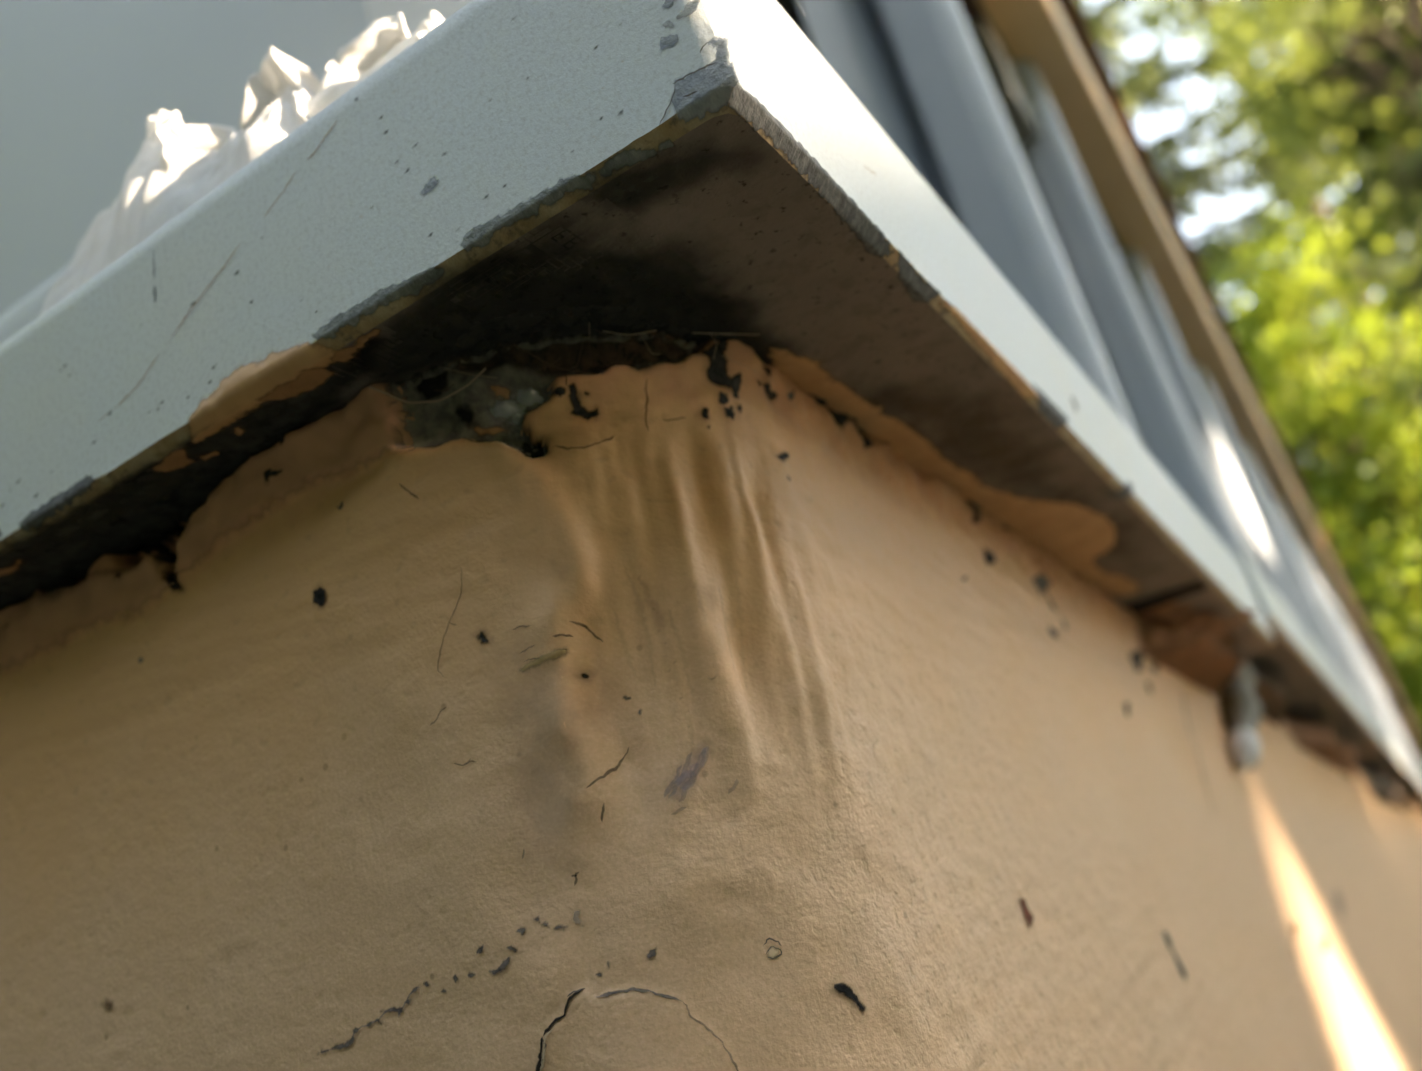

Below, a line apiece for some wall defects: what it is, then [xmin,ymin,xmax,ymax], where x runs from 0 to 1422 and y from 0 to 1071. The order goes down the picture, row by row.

leakage [591,152,744,212]
leakage [0,221,787,610]
flaking render [386,330,874,458]
spalling [1033,383,1068,429]
spalling [20,476,95,531]
flaking render [114,511,196,590]
peeling [984,549,996,563]
spalling [313,587,325,606]
crack [321,872,580,1053]
crack [535,987,738,1071]